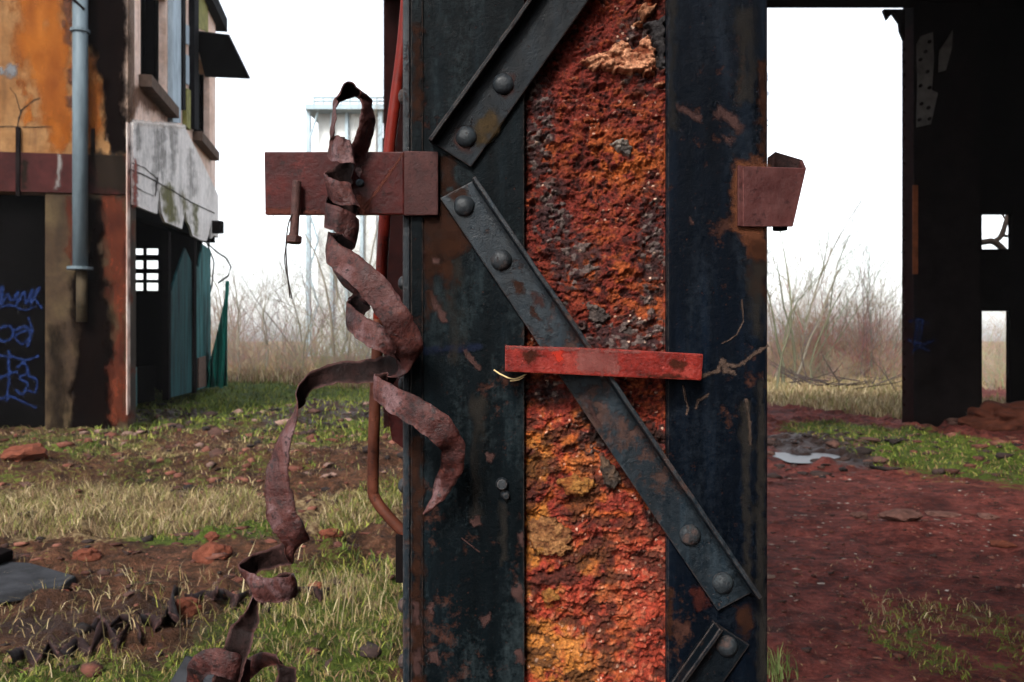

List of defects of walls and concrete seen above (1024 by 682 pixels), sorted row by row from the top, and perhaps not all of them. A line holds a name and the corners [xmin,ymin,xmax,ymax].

rust [13,0,72,153]
rust [88,55,102,152]
water stain [46,0,166,430]
water stain [161,184,199,235]
rust [266,208,320,216]
spalling [579,2,665,88]
rust [730,61,771,296]
rust [101,159,138,425]
rust [409,436,425,682]